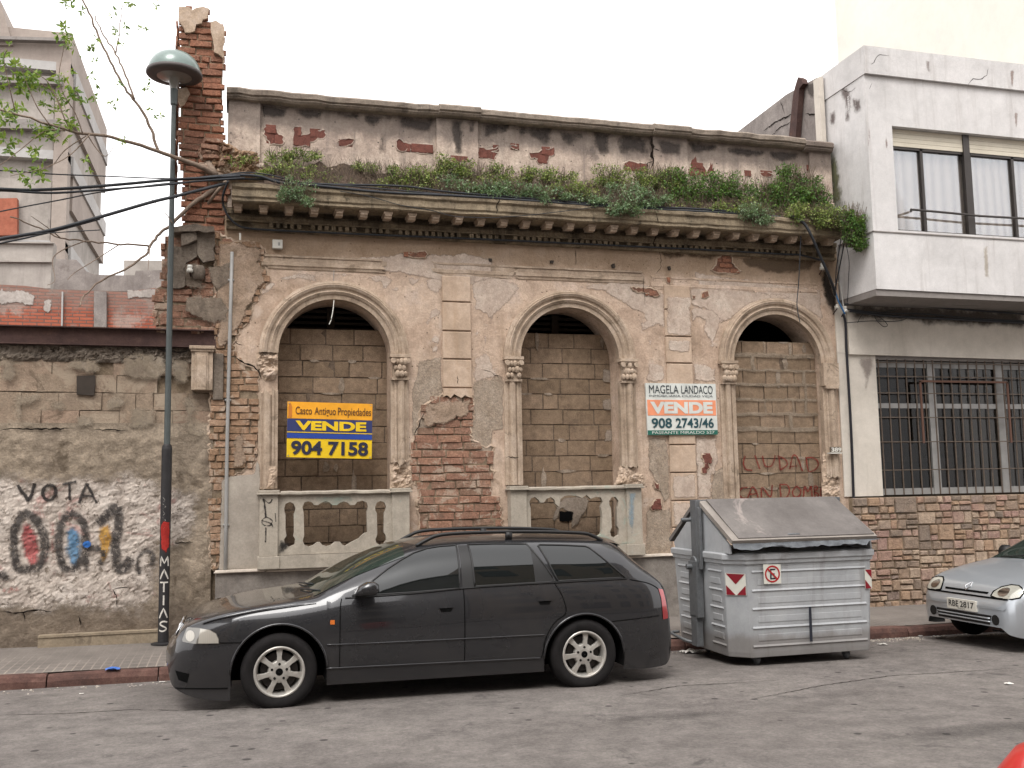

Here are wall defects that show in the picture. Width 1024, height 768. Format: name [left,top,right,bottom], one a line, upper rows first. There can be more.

spalling [263,124,355,148]
leakage [401,118,432,130]
spalling [451,143,556,165]
leakage [452,121,582,153]
leakage [595,132,647,153]
crack [647,137,659,167]
leakage [660,141,715,153]
leakage [730,149,797,162]
crack [765,102,815,135]
peeling [587,249,822,352]
spalling [390,336,504,536]
peeling [614,438,718,525]